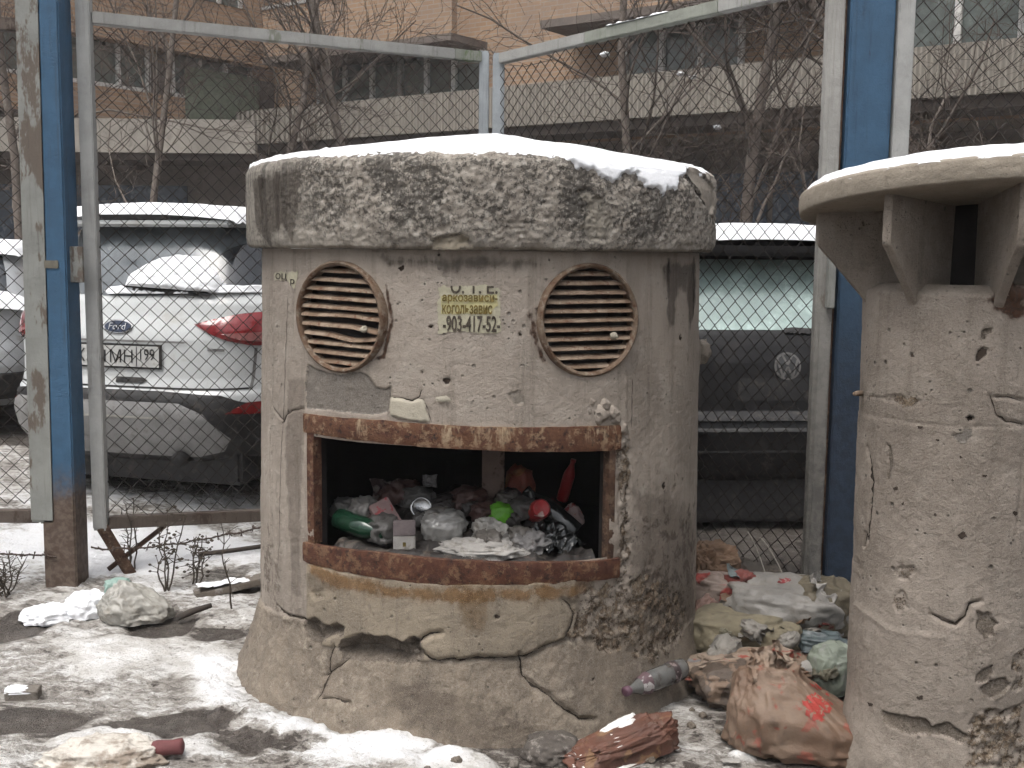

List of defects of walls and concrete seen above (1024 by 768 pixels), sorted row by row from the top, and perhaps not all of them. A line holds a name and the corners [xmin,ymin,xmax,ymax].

spalling [686,166,715,216]
crack [866,455,875,541]
corrosion [311,565,587,602]
spalling [562,445,686,666]
crack [318,645,350,703]
spalling [303,618,424,664]
crack [421,599,592,720]
spalling [976,612,998,639]
spalling [880,649,1024,768]